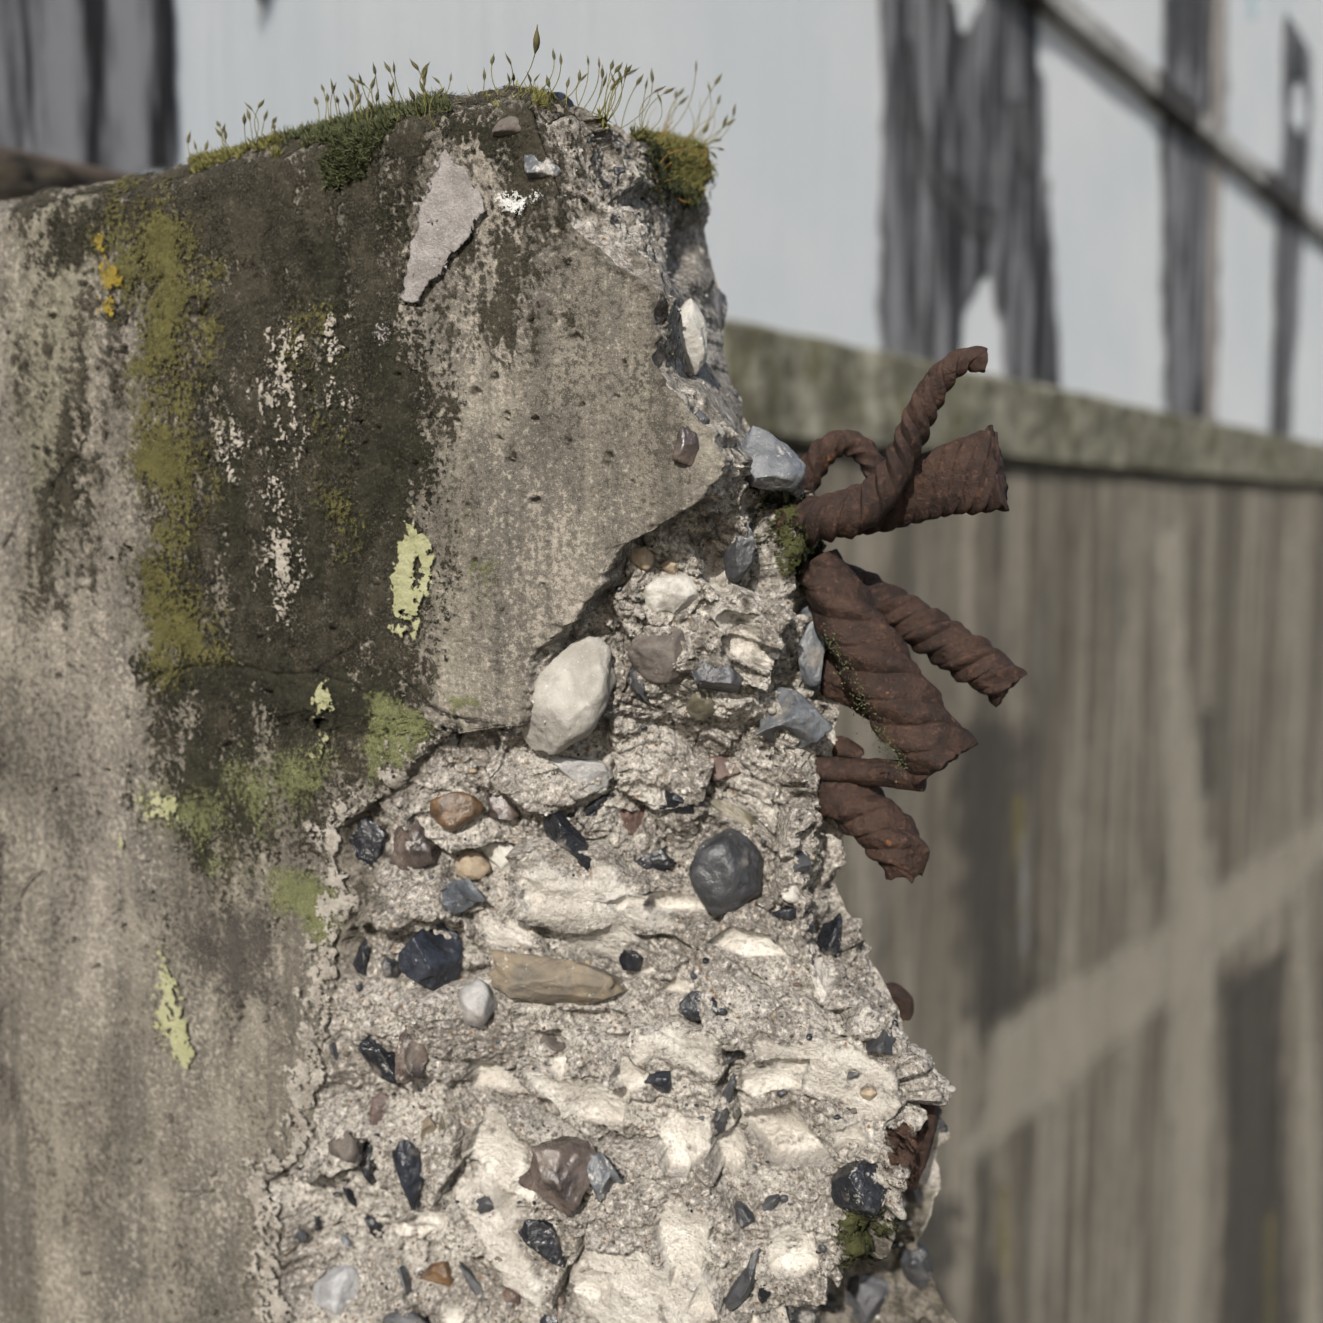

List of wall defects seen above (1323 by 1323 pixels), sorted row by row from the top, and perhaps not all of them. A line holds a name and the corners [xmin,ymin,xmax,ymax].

damp [0,83,604,1047]
crack [134,650,523,747]
spalling [235,92,956,1323]
corrosion [776,346,1028,883]